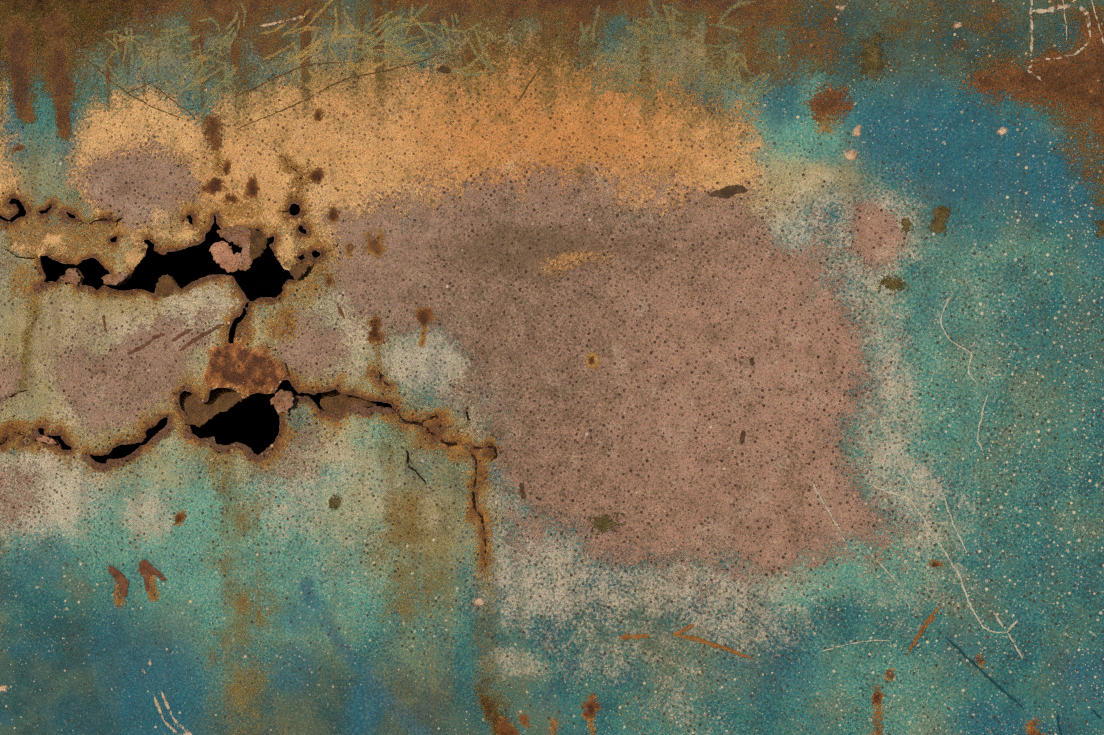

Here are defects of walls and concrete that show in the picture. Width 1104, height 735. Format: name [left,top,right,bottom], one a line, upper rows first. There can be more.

corrosion [0,0,1104,223]
peeling [60,268,82,286]
peeling [0,274,244,442]
corrosion [202,338,288,398]
corrosion [367,316,385,370]
corrosion [415,307,435,348]
peeling [64,28,933,608]
peeling [0,460,48,538]
crack [363,360,504,582]
corrosion [469,605,530,735]
corrosion [579,691,600,735]
corrosion [871,667,894,735]